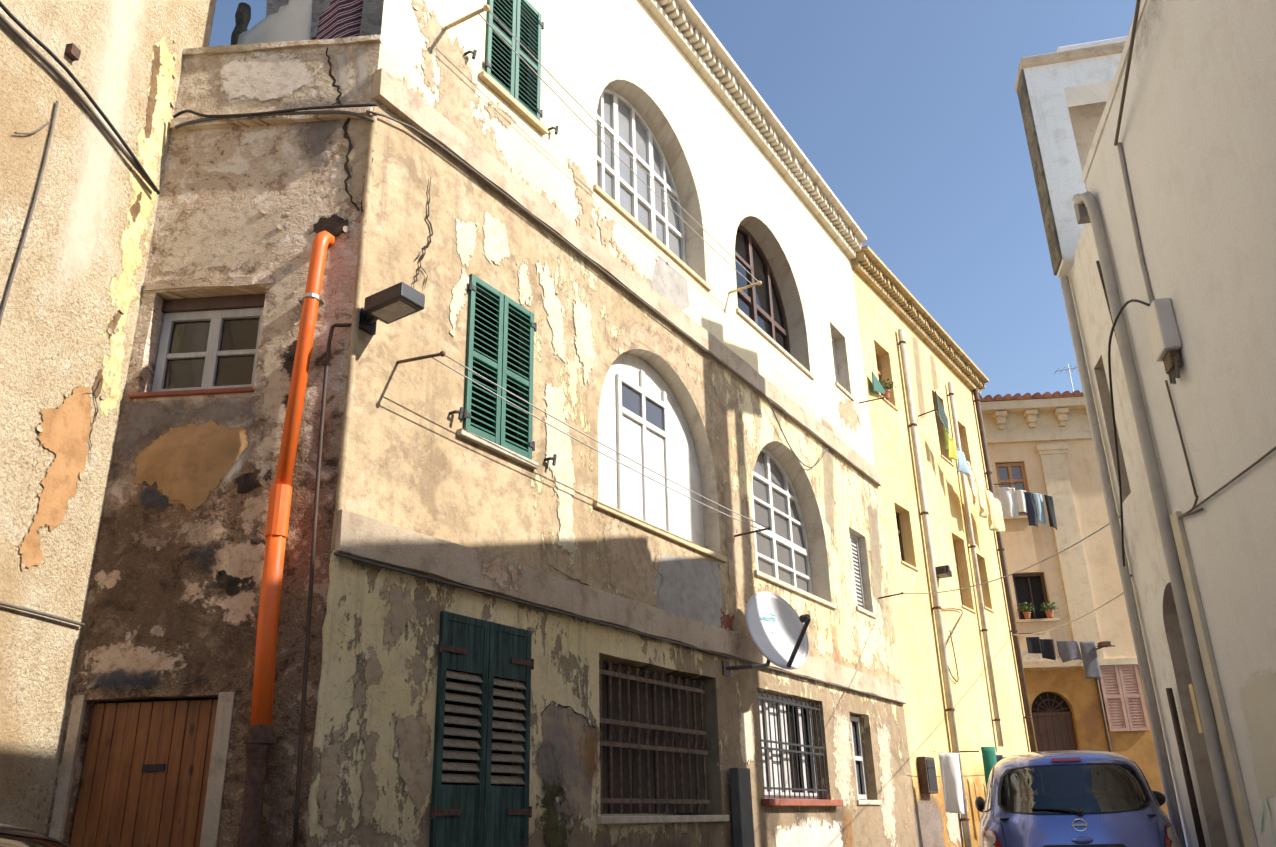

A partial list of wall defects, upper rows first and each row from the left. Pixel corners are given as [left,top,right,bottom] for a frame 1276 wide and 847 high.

spalling [313,213,350,240]
crack [326,47,373,233]
flaking render [339,118,377,208]
crack [413,177,433,288]
peeling [398,0,659,292]
flaking render [19,36,314,633]
water stain [121,396,260,471]
water stain [225,440,252,479]
spalling [76,623,189,689]
peeling [317,577,432,847]
flaking render [774,705,856,847]
flaking render [876,718,899,847]